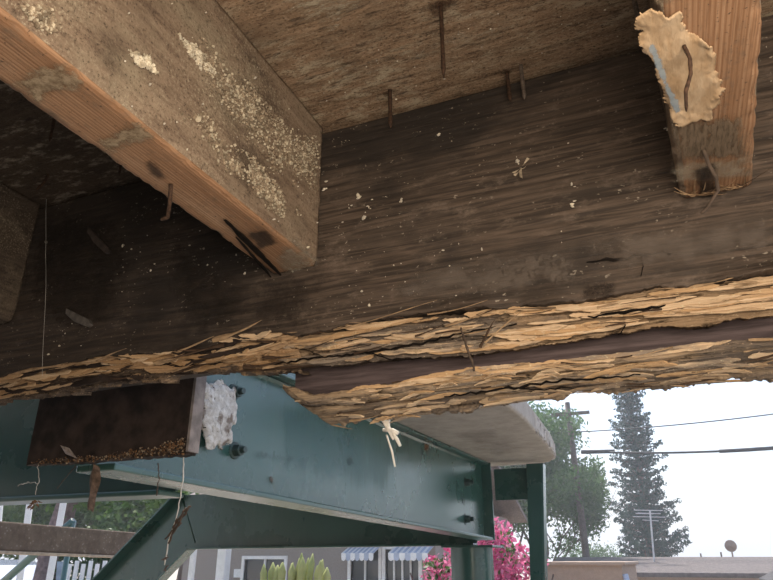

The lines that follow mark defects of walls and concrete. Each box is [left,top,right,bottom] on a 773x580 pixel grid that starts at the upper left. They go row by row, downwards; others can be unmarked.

peeling [0,276,773,450]